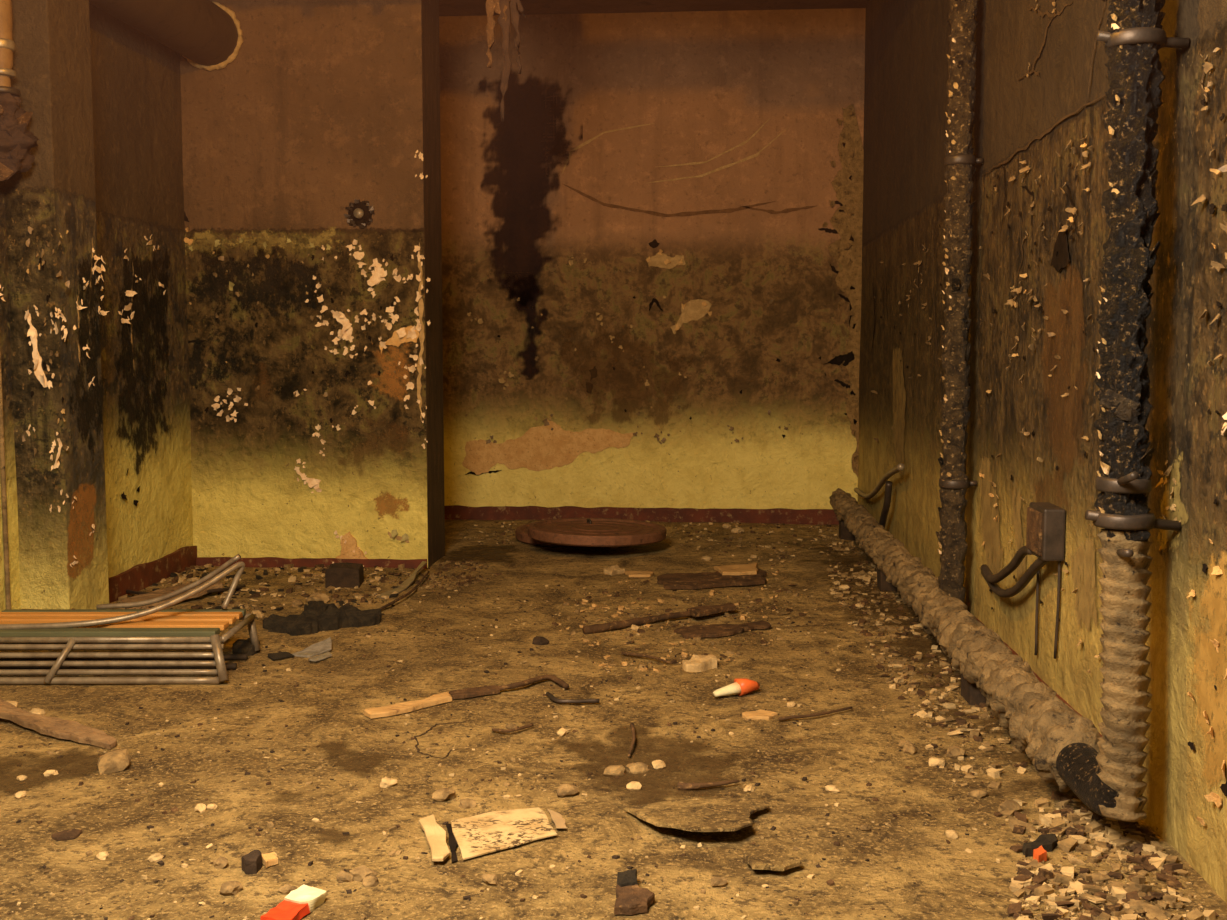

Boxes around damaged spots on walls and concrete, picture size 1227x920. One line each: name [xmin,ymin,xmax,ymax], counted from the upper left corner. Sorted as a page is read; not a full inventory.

peeling [22,210,141,470]
damp [116,248,173,506]
peeling [205,388,248,422]
damp [185,227,343,392]
peeling [294,458,322,493]
peeling [312,418,341,456]
peeling [302,199,431,423]
peeling [462,414,670,475]
flaking render [1186,539,1227,808]